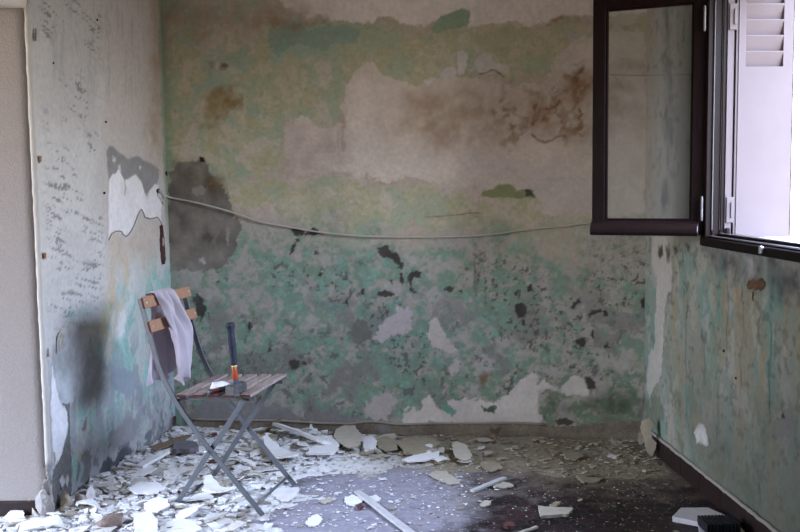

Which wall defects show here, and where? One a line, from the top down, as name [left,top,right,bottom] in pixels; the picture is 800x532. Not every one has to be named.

peeling [312,0,593,35]
peeling [609,9,648,17]
peeling [279,28,593,223]
rust [453,58,593,159]
peeling [608,28,647,218]
flaking render [105,145,243,272]
flaking render [289,226,325,258]
peeling [39,348,88,508]
damp [47,206,175,486]
flaking render [173,236,673,463]
damp [648,236,800,434]